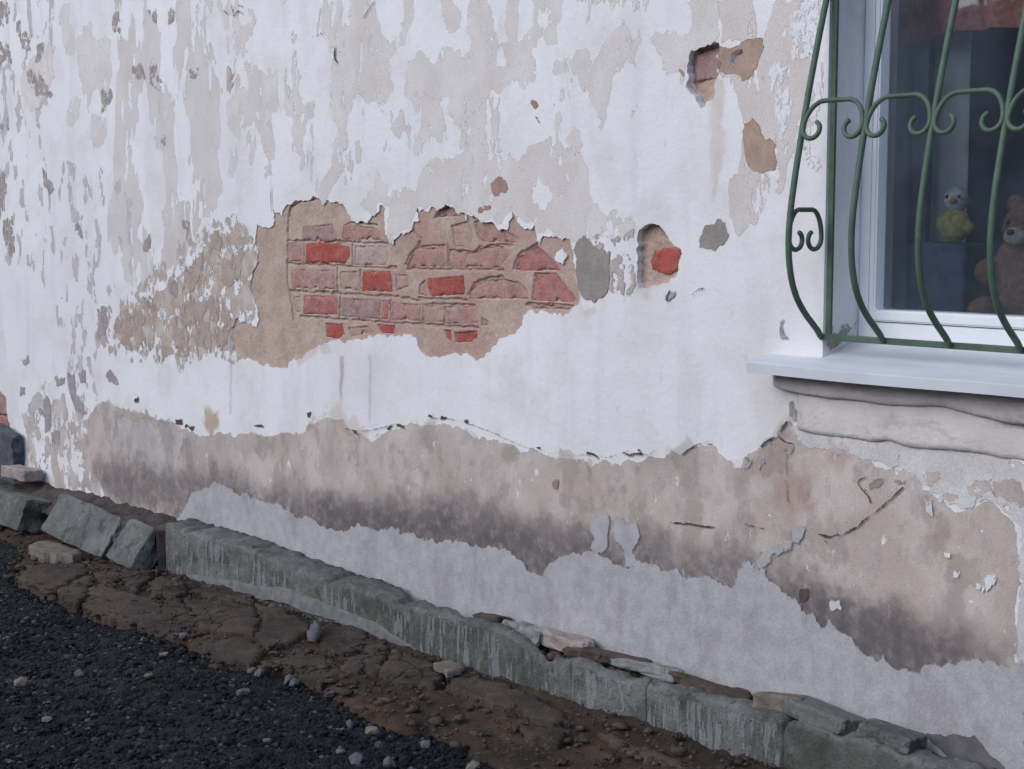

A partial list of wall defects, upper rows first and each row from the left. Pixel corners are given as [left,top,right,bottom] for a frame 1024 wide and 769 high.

peeling [0,0,55,222]
peeling [650,0,814,251]
peeling [38,161,87,237]
spalling [59,0,649,377]
peeling [36,226,79,282]
spalling [608,224,682,300]
spalling [0,392,10,427]
leakage [104,467,622,576]
flaking render [22,381,1024,674]
crack [670,522,763,530]
crack [819,476,903,543]
leakage [768,578,971,672]